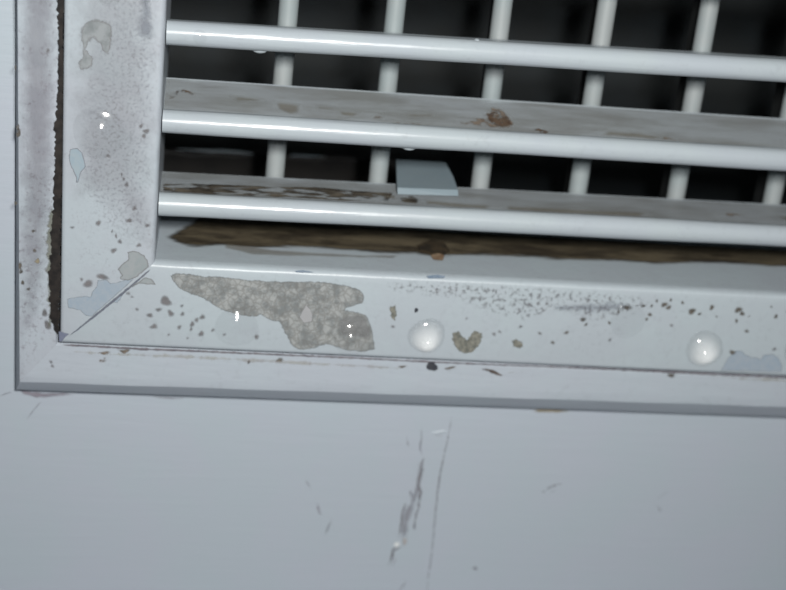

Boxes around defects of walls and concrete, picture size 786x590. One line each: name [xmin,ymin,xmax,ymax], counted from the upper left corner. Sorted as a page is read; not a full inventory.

peeling [79,20,112,69]
corrosion [465,108,512,127]
peeling [68,251,155,316]
peeling [171,270,375,352]
peeling [452,331,482,353]
peeling [722,351,782,372]
crack [390,424,451,587]